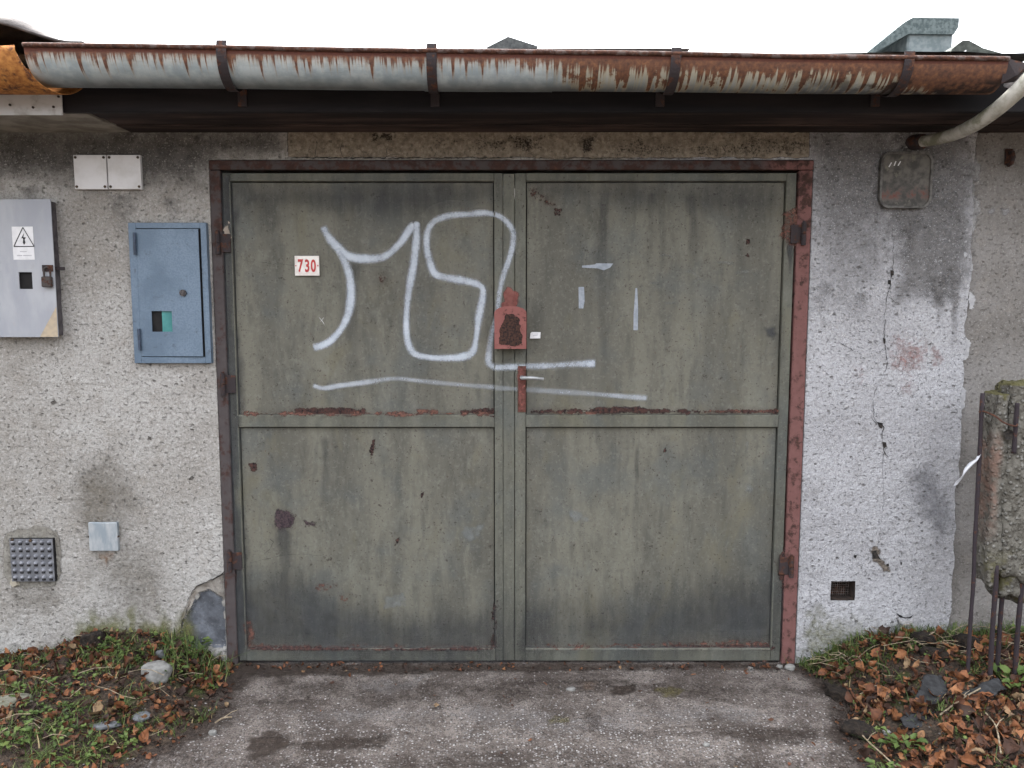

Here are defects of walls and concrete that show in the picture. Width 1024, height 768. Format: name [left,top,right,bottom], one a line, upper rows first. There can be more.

damp [815,134,970,306]
corrosion [499,314,523,347]
crack [871,229,902,534]
corrosion [243,407,494,418]
corrosion [531,406,779,415]
corrosion [274,509,315,529]
spalling [871,546,902,572]
spalling [180,572,226,648]